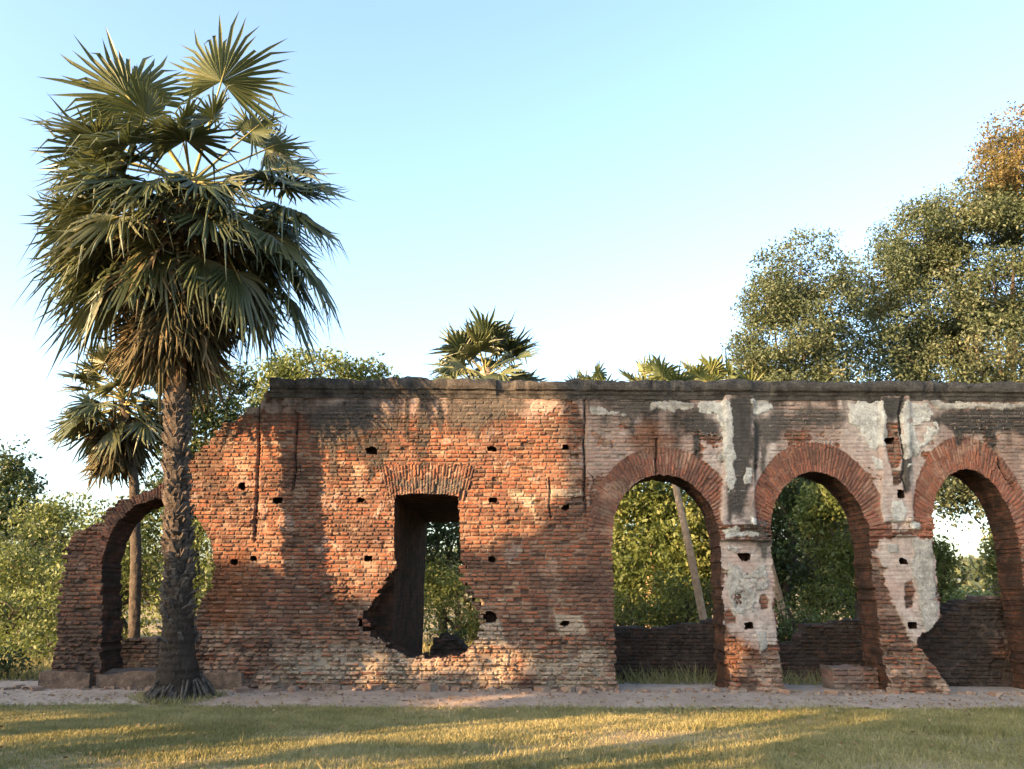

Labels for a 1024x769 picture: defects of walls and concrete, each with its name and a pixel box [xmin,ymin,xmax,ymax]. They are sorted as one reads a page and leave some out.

crack [250,407,266,540]
crack [549,400,594,511]
peeling [650,399,752,493]
peeling [750,398,774,415]
peeling [848,400,1024,631]
peeling [722,517,770,651]